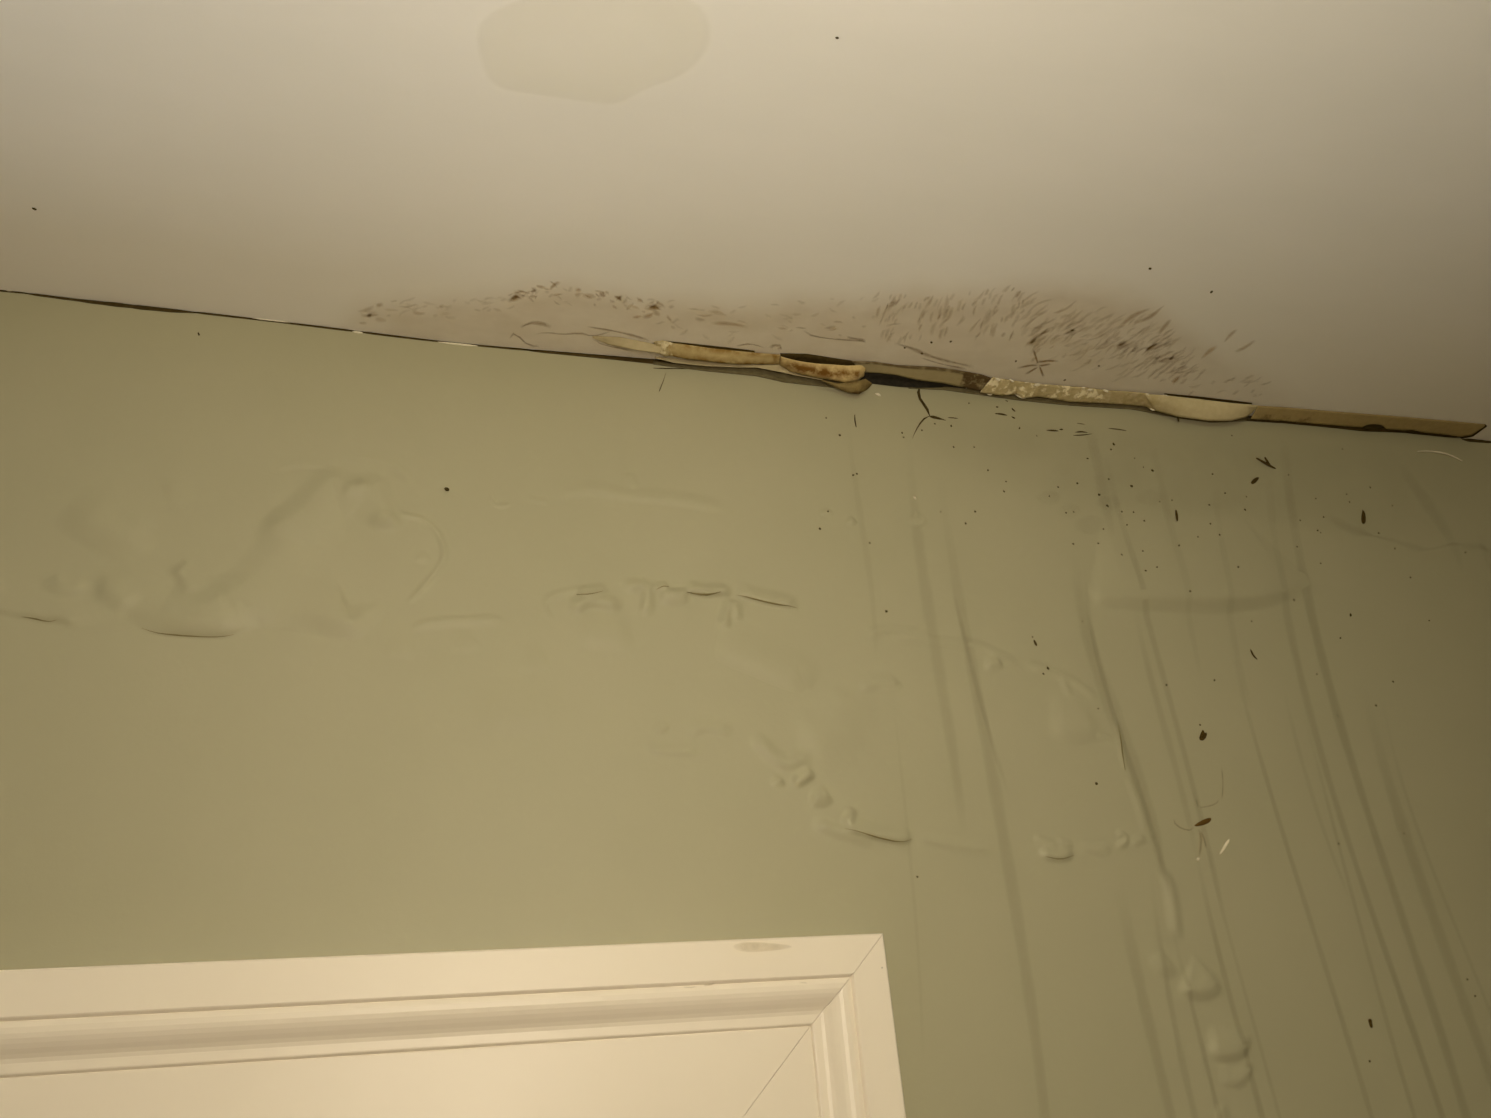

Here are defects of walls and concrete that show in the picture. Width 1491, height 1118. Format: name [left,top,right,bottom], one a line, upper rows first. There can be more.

peeling [1145,394,1258,421]